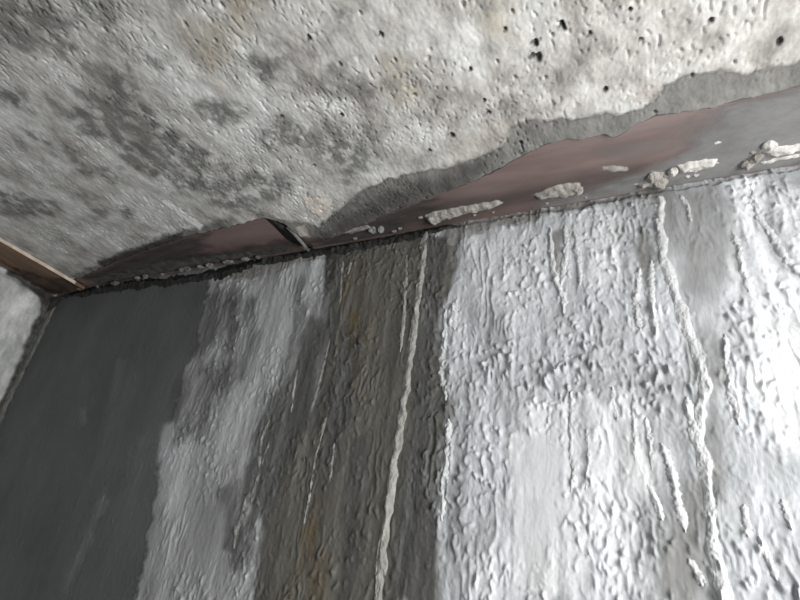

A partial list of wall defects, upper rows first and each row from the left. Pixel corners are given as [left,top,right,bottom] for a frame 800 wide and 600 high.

flaking render [231,255,327,279]
flaking render [444,189,659,246]
flaking render [554,231,562,267]
water stain [547,213,624,314]
flaking render [638,231,651,276]
water stain [727,174,800,452]
water stain [233,231,458,600]
water stain [632,195,734,600]
water stain [722,334,741,425]
water stain [469,387,689,600]
water stain [740,504,779,581]
water stain [779,499,795,531]